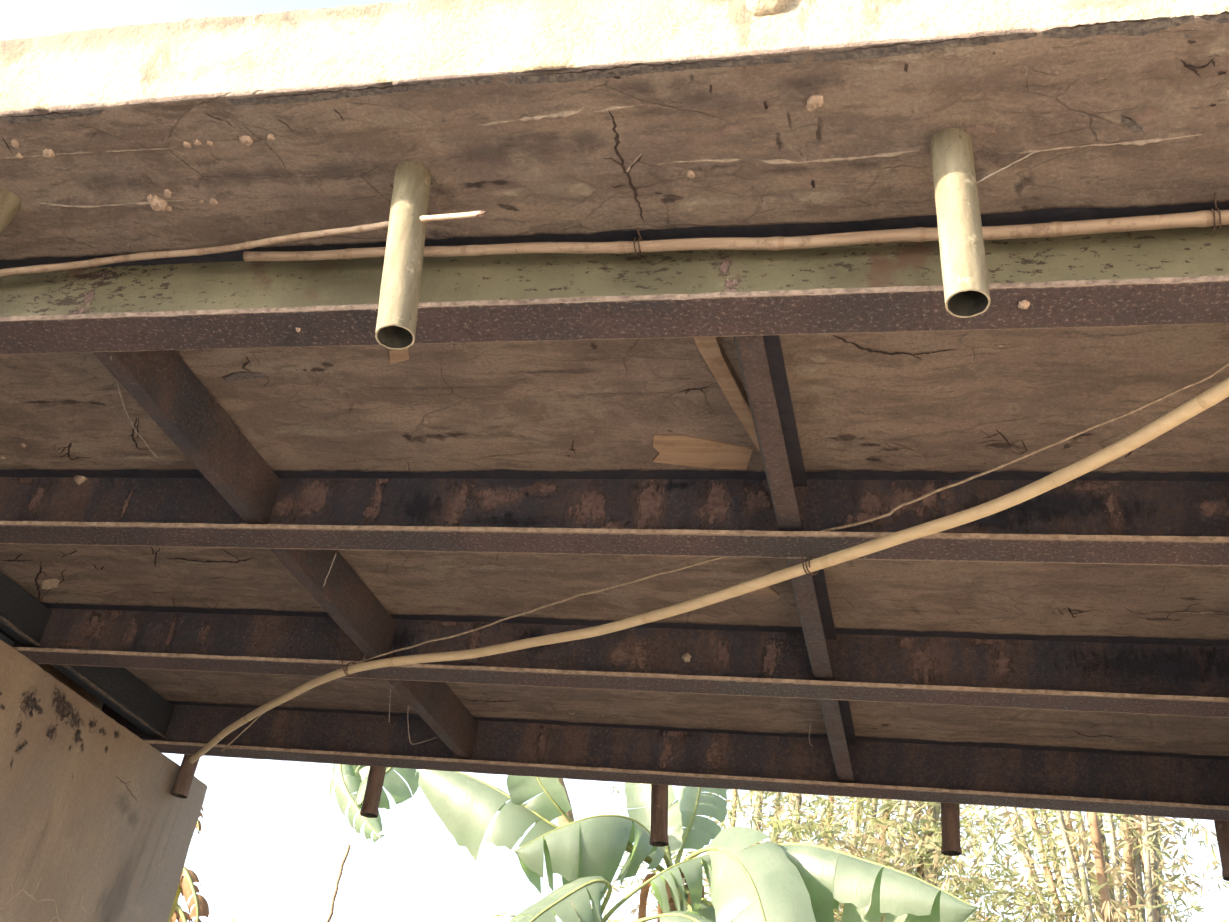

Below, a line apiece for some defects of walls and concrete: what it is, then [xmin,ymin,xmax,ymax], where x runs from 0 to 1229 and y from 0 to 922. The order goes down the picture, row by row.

crack [603,111,645,222]
crack [833,335,956,359]
rust [364,479,389,526]
rust [440,479,561,527]
rust [567,480,665,529]
rust [693,481,773,530]
rust [846,481,946,529]
rust [1073,481,1123,530]
crack [1058,607,1091,618]
rust [605,630,659,673]
rust [889,637,941,685]
leakage [10,688,119,769]